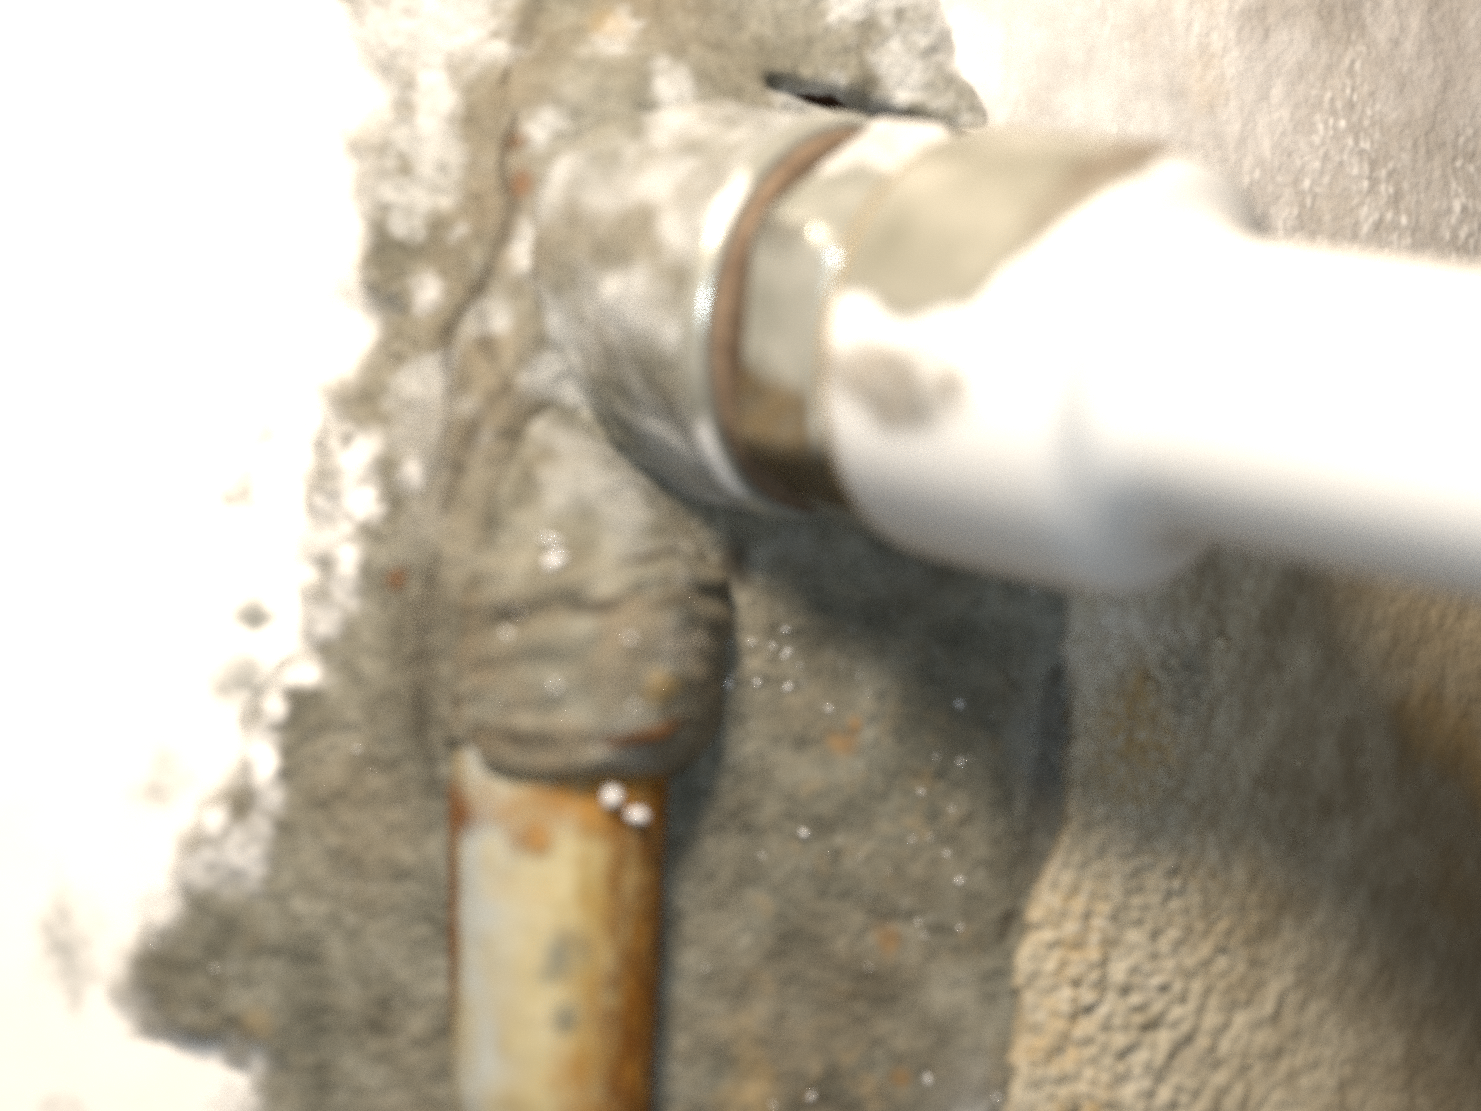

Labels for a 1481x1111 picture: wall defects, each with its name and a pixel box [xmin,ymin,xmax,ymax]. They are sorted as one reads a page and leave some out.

peeling [417,280,437,309]
peeling [243,608,266,626]
peeling [302,403,385,636]
peeling [400,463,422,488]
peeling [175,662,321,883]
rust [447,784,468,1012]
rust [541,773,667,1111]